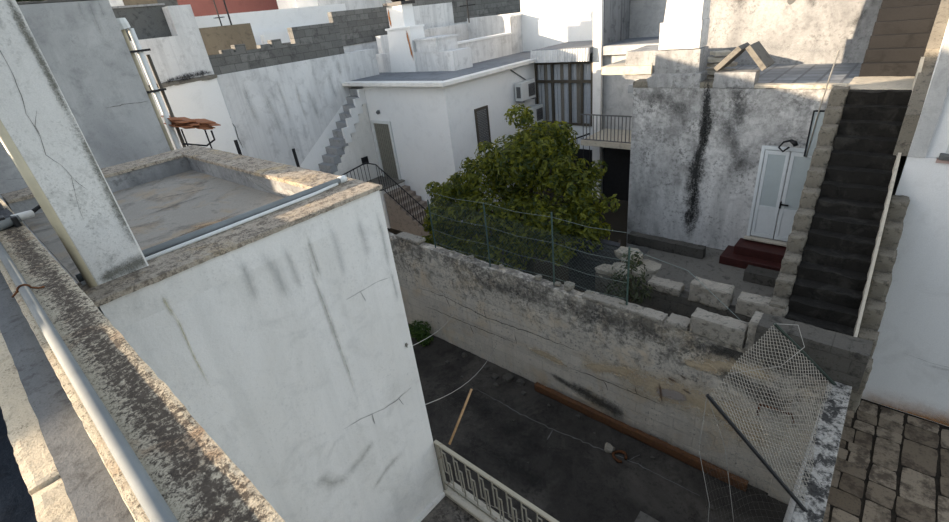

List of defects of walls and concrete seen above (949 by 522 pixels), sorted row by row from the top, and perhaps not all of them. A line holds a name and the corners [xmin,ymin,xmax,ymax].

crack [0,51,85,220]
water stain [684,84,712,232]
water stain [103,256,145,280]
crack [417,287,665,406]
water stain [553,375,621,416]